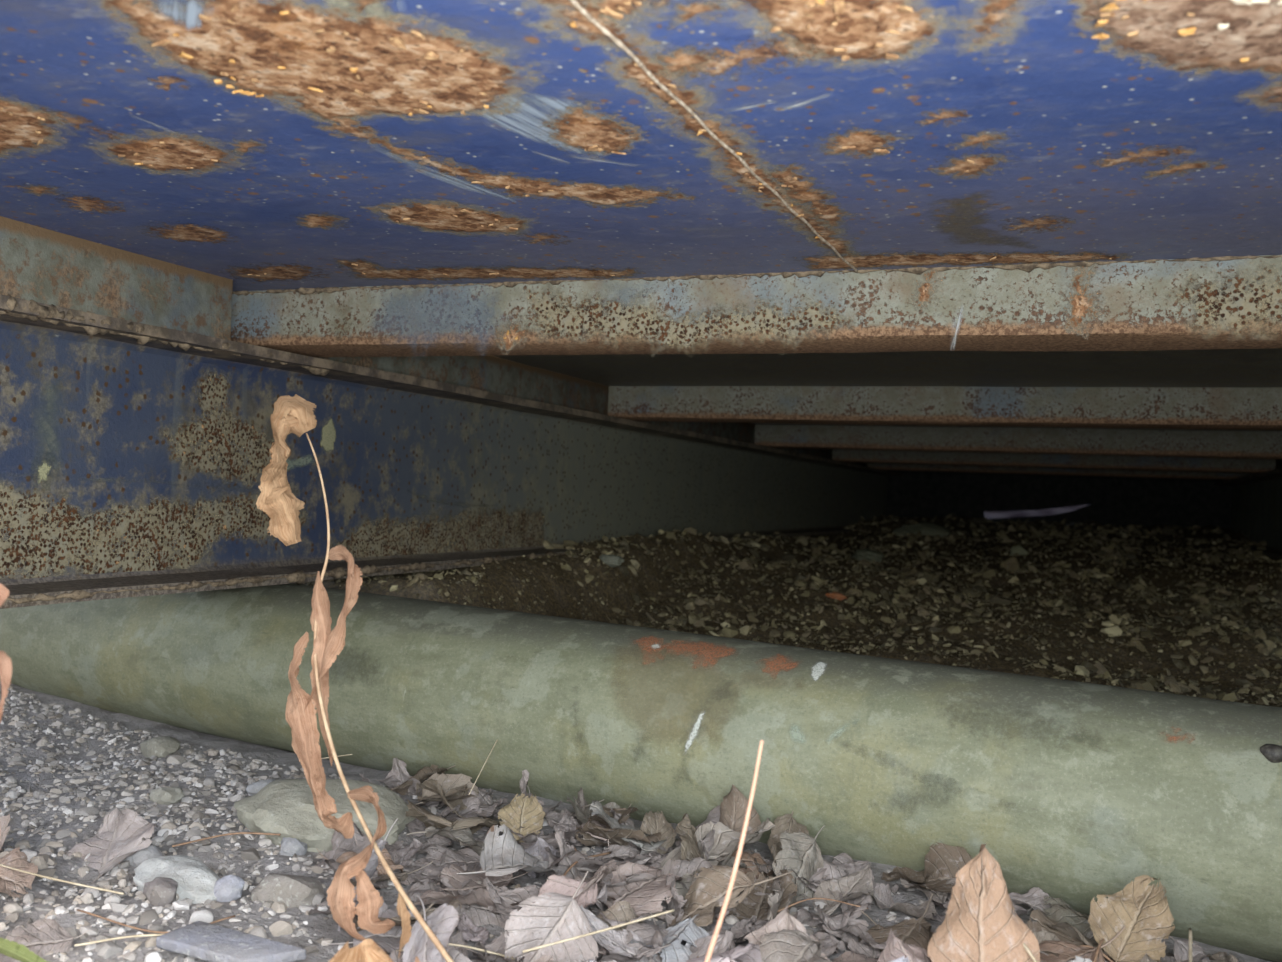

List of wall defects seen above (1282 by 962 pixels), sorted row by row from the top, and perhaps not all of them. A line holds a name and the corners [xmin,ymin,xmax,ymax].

rust [0,97,281,177]
rust [89,0,696,246]
rust [226,0,1282,354]
rust [0,295,330,377]